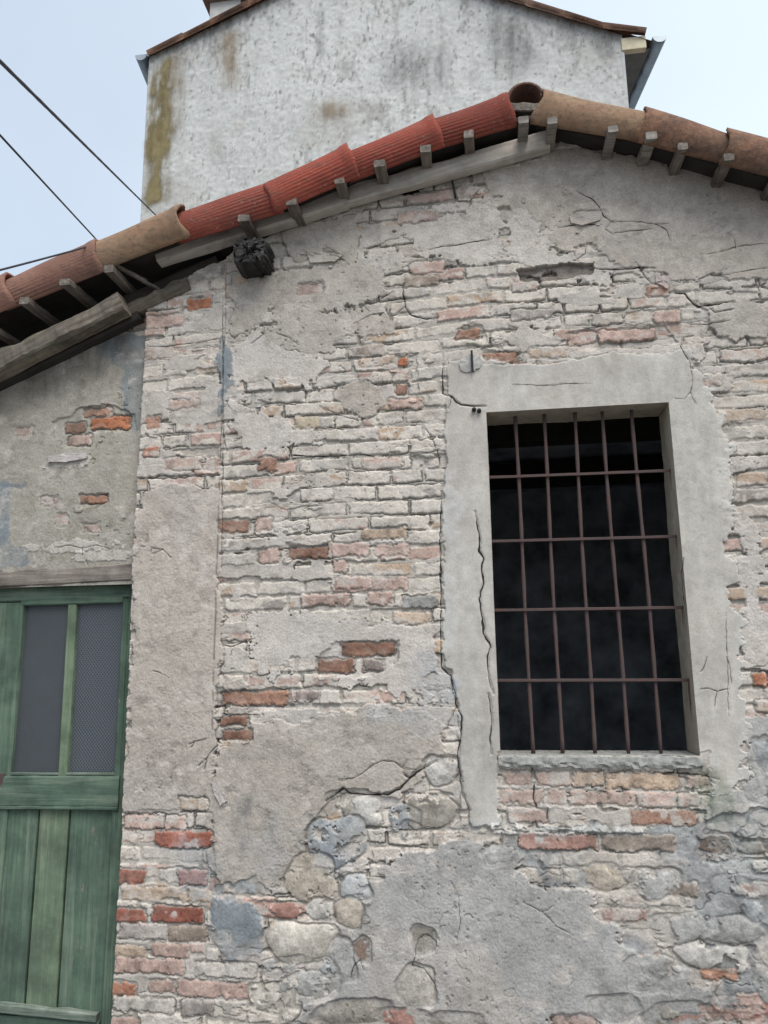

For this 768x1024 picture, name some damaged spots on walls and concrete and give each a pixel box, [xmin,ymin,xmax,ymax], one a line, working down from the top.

leakage [145,58,175,206]
spalling [516,261,595,284]
crack [560,192,669,283]
crack [442,365,481,408]
spalling [42,403,138,469]
spalling [315,639,400,680]
crack [327,499,470,810]
crack [475,514,494,750]
spalling [213,686,296,744]
spalling [500,767,768,876]
spalling [111,753,463,1024]
spalling [669,937,757,976]